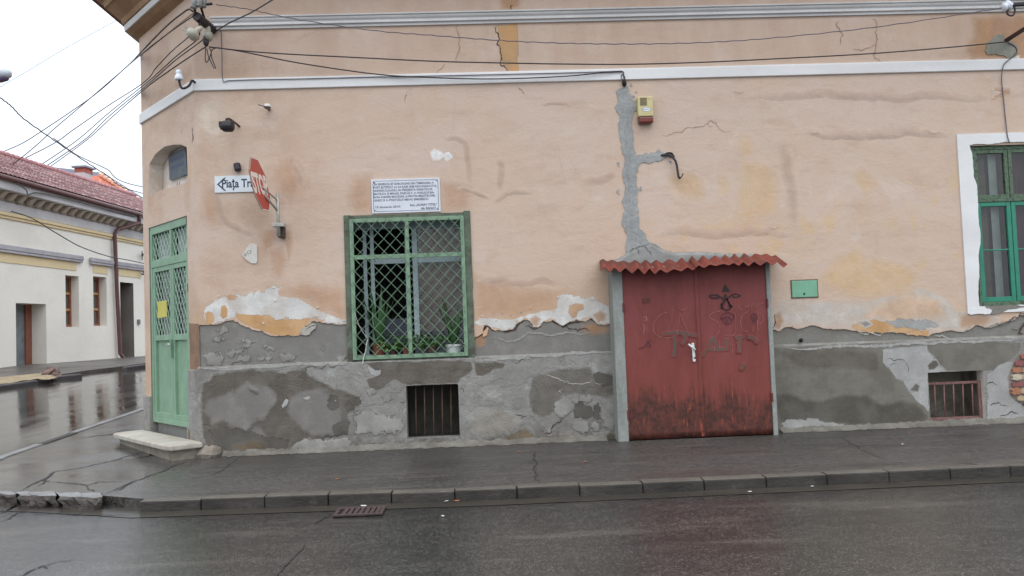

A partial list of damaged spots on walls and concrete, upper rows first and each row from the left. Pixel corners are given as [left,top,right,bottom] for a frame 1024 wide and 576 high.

crack [495,5,524,94]
flaking render [189,285,351,371]
flaking render [474,294,612,361]
peeling [771,285,1024,406]
flaking render [292,387,405,449]
flaking render [554,394,615,435]